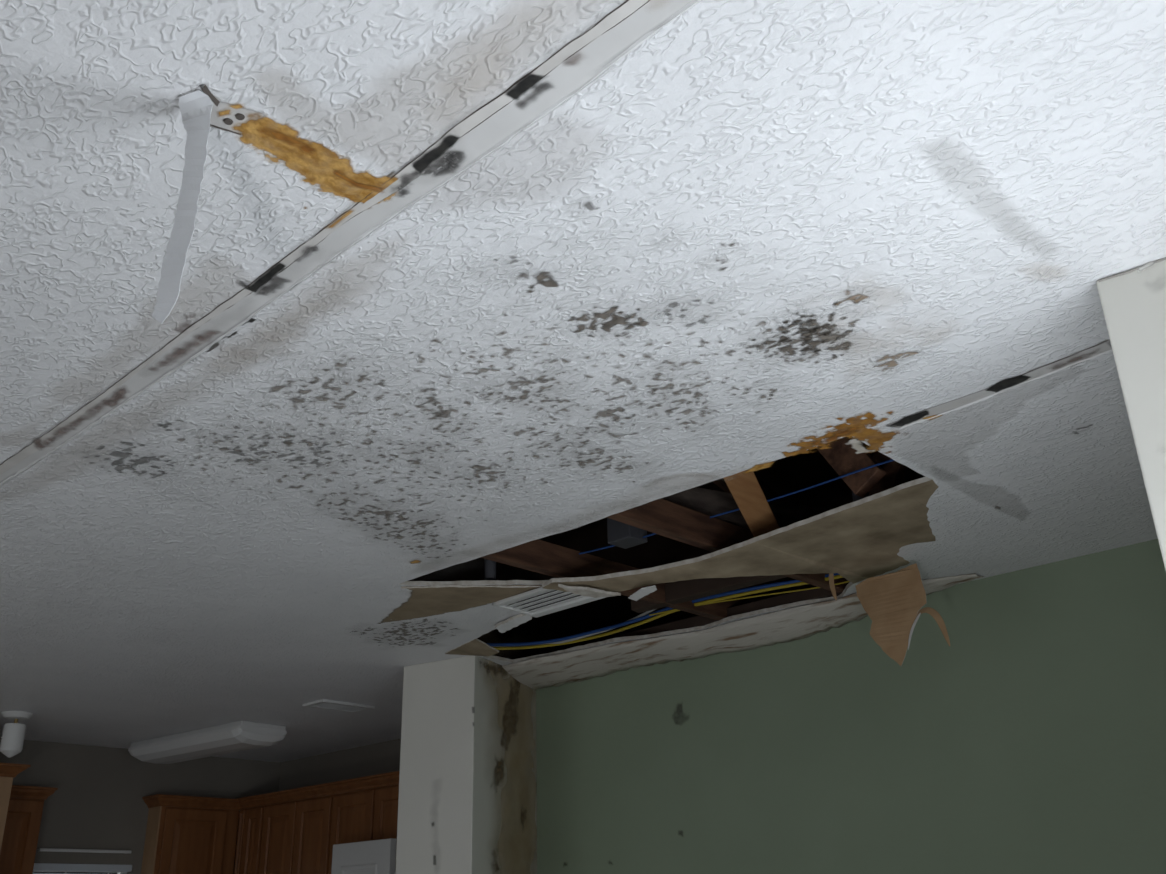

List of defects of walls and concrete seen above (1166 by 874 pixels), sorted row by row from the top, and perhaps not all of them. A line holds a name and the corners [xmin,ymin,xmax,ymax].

peeling [200,85,264,135]
water stain [240,263,288,295]
water stain [510,257,559,293]
mould [750,291,867,363]
water stain [875,352,918,370]
mould [35,389,125,448]
mould [191,300,749,558]
mould [86,442,173,478]
peeling [378,585,542,624]
peeling [628,585,657,601]
spalling [445,593,869,690]
water stain [484,660,537,874]